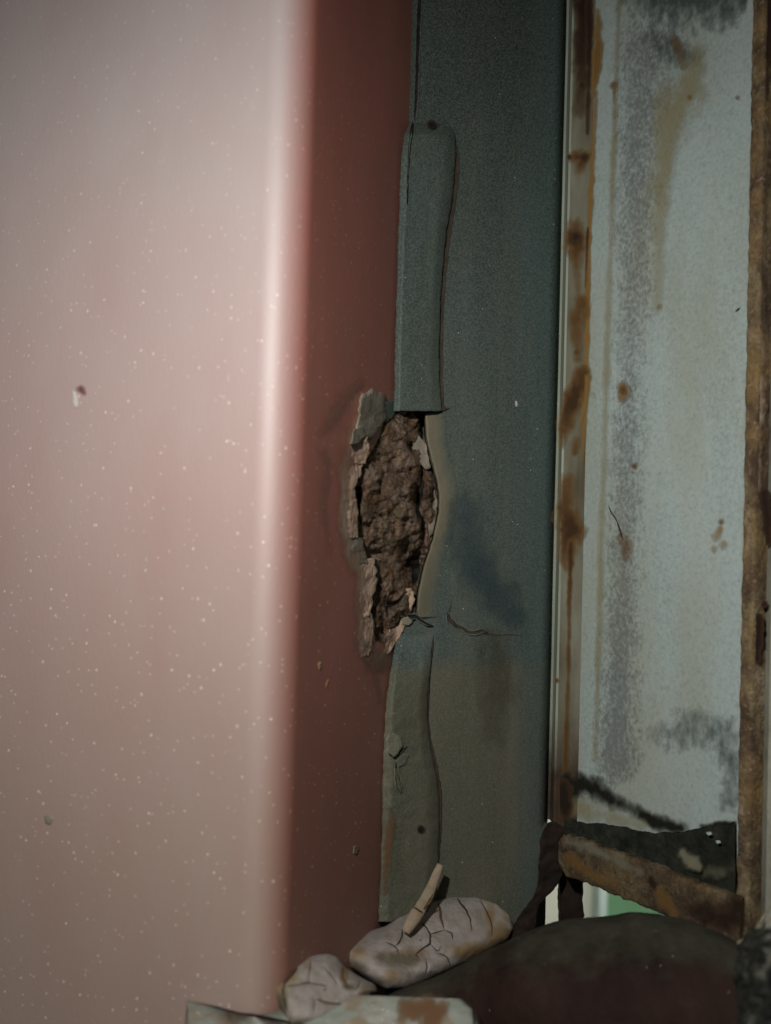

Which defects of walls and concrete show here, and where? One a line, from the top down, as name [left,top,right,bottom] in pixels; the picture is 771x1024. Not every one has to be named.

leakage [637,0,747,22]
rust [558,0,603,455]
rust [619,383,628,400]
spalling [338,411,459,663]
rust [759,488,771,545]
crack [401,600,520,636]
rust [555,476,584,818]
rust [755,601,768,664]